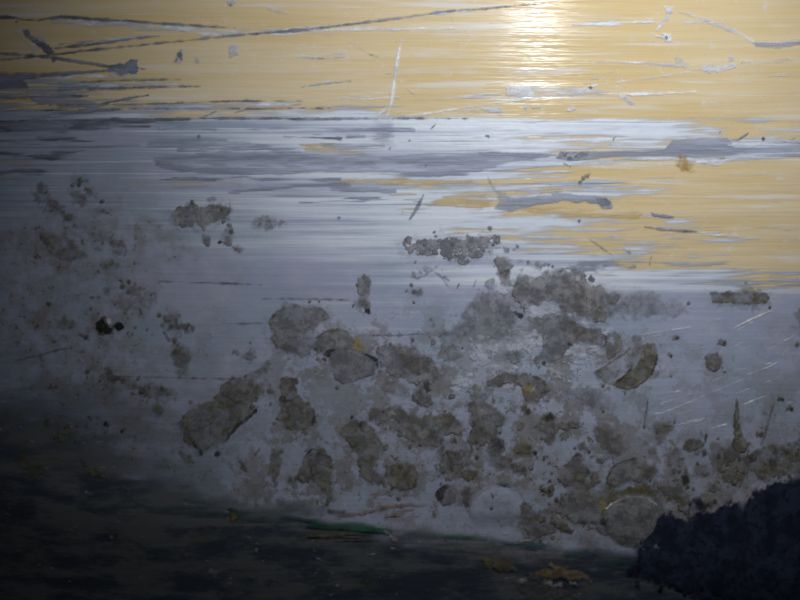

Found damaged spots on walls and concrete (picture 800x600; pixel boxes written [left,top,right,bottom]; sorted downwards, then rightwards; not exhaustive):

spalling [24,29,55,62]
spalling [109,59,138,75]
peeling [659,137,800,161]
spalling [683,439,704,451]
spalling [436,484,472,505]